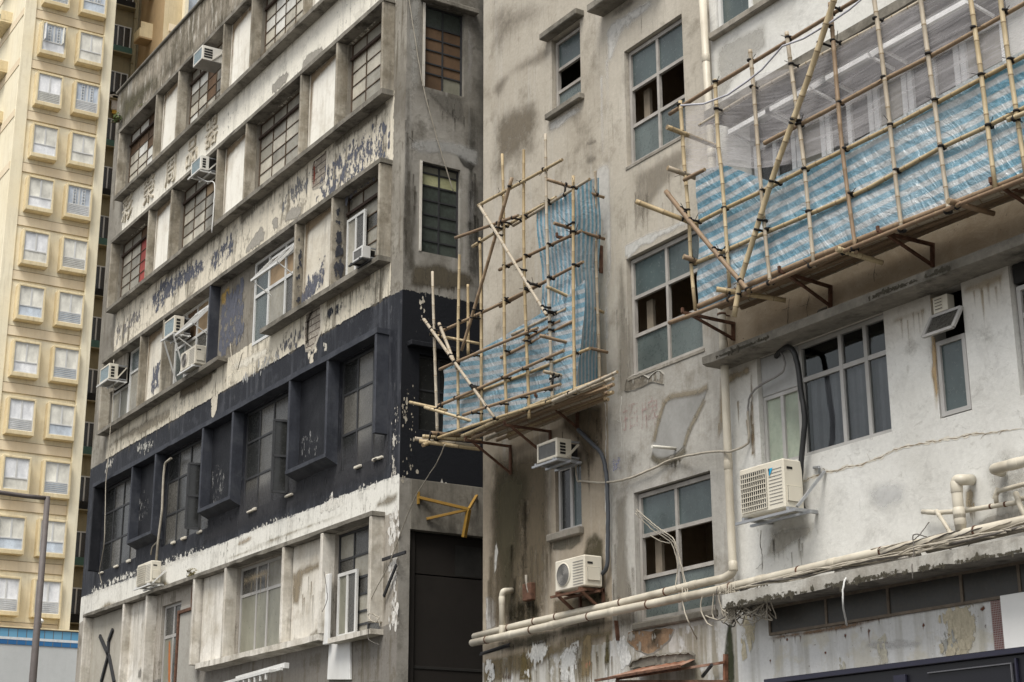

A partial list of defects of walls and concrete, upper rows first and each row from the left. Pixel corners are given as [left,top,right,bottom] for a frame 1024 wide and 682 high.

leakage [498,108,534,170]
peeling [152,232,233,313]
peeling [242,117,390,384]
peeling [359,393,419,495]
crack [803,428,1022,482]
leakage [486,457,630,629]
peeling [90,572,135,597]
peeling [527,641,548,670]
peeling [560,641,579,682]
leakage [617,612,633,627]
flaking render [616,626,696,670]
spalling [725,547,1022,665]